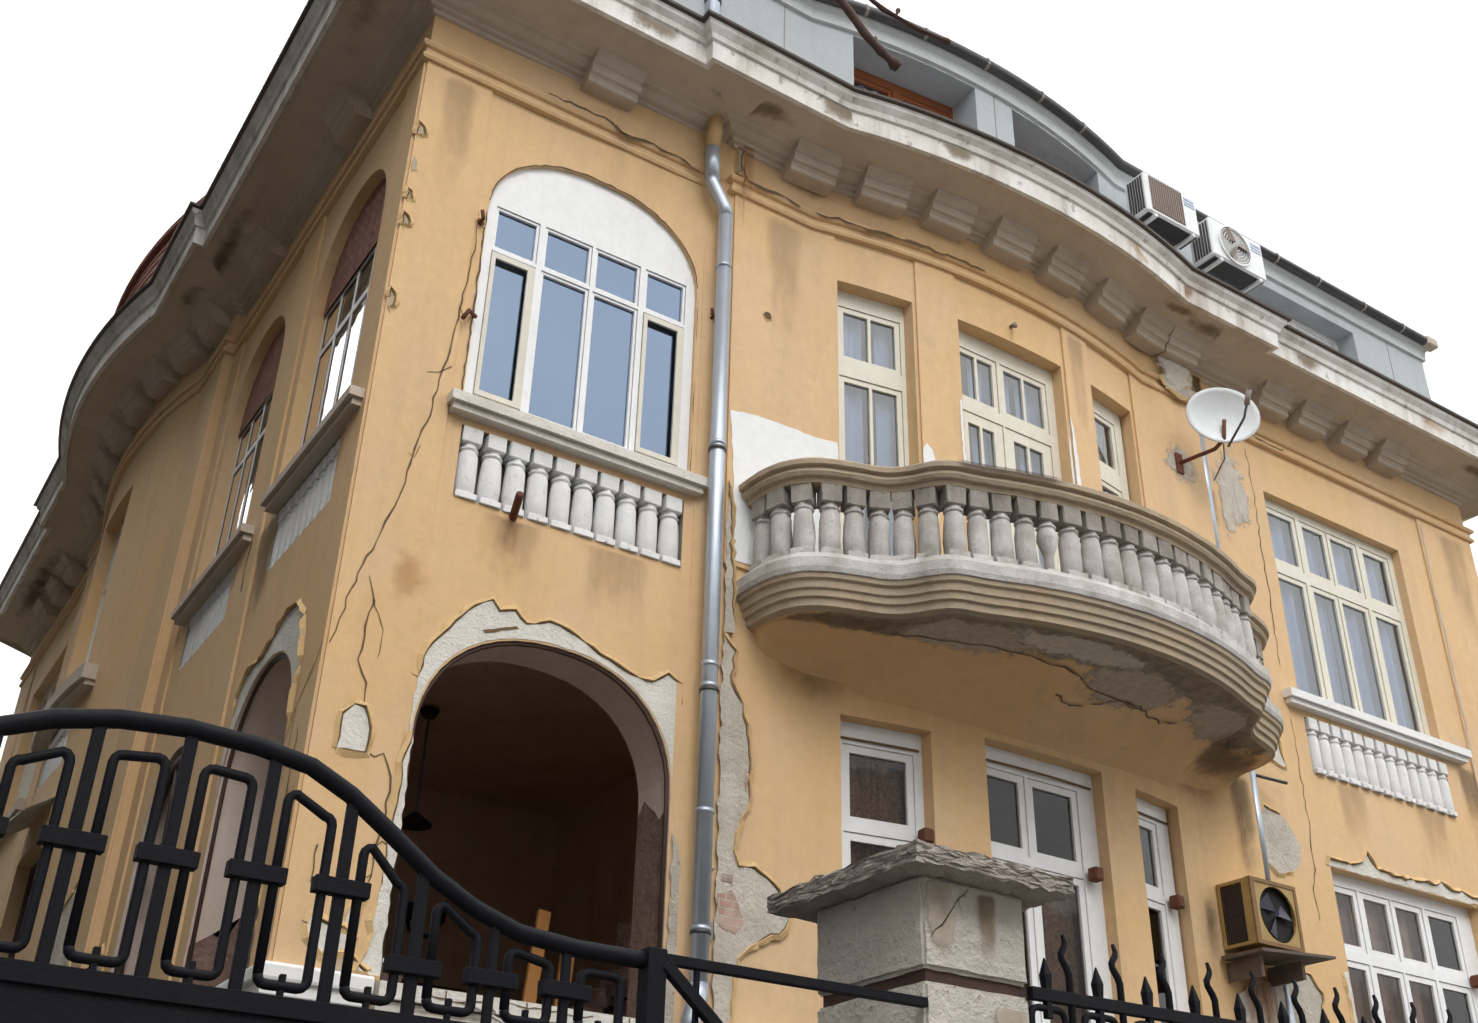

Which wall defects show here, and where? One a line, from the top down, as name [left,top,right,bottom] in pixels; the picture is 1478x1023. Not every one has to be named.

crack [549,93,700,172]
crack [742,165,985,271]
crack [278,165,698,794]
spalling [331,699,376,758]
spalling [387,596,683,830]
spalling [709,480,793,1023]
crack [310,844,318,882]
spalling [300,839,397,981]
crack [366,753,392,883]
spalling [1326,849,1478,909]
spalling [664,978,675,1023]
spalling [1239,971,1325,1023]